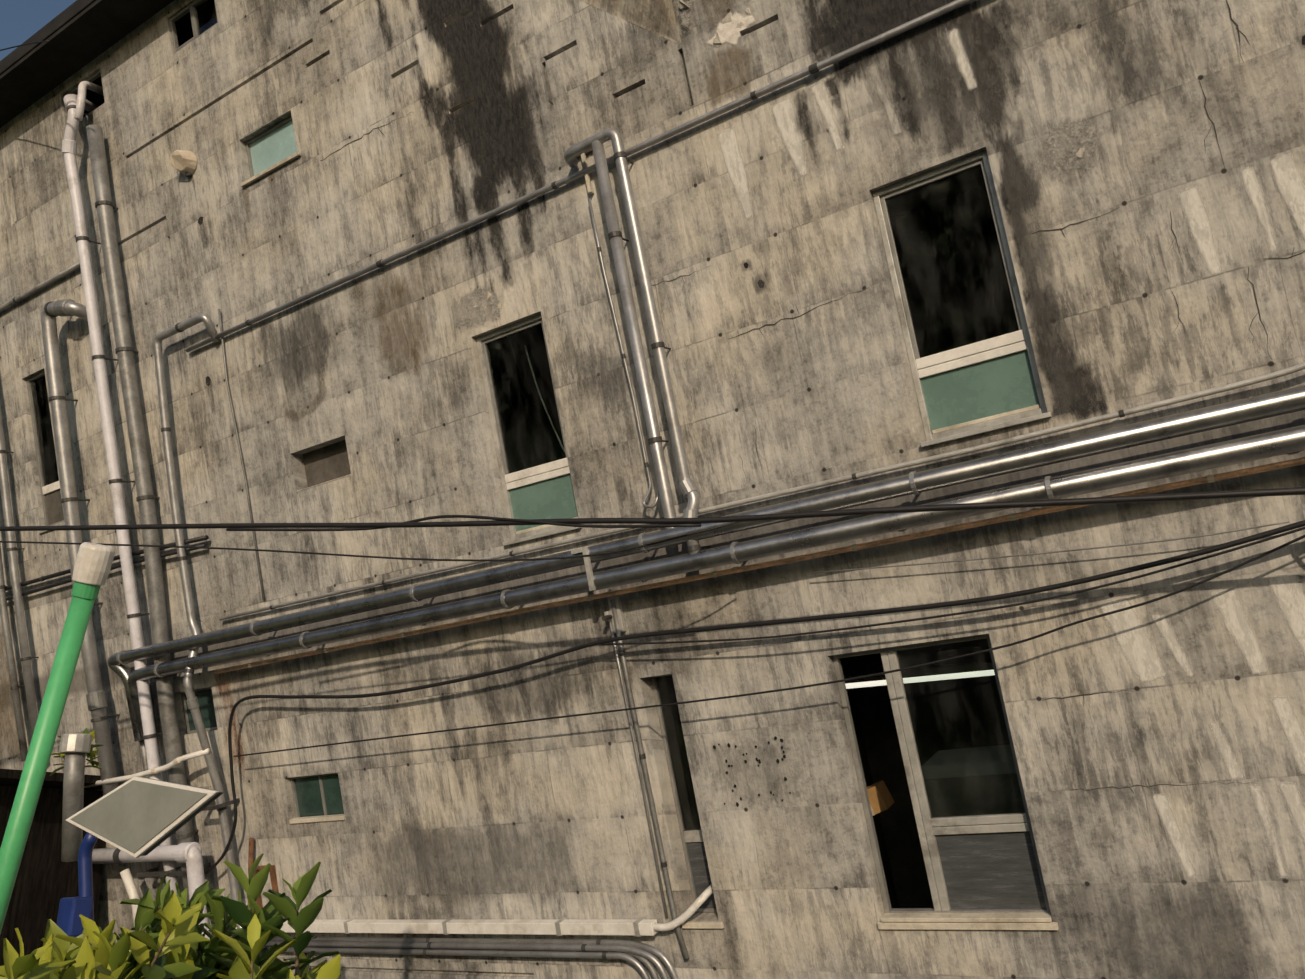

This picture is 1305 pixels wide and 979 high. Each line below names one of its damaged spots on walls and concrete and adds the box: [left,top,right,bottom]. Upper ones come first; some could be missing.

water stain [377,0,392,47]
spalling [706,8,755,47]
water stain [405,0,546,292]
water stain [718,128,752,218]
water stain [772,0,1107,419]
crack [1032,207,1119,237]
crack [1199,81,1225,168]
crack [729,287,869,339]
crack [1247,249,1305,359]